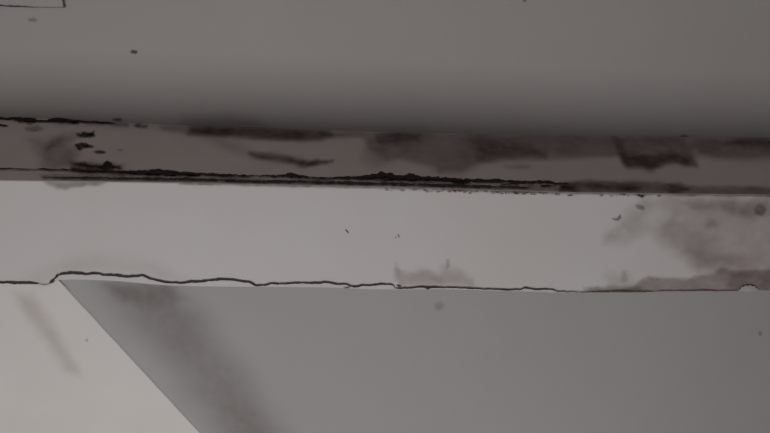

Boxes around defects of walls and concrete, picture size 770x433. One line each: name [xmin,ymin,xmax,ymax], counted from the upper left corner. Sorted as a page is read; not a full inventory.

mould [71,131,120,173]
leakage [496,183,582,193]
crack [0,272,739,293]